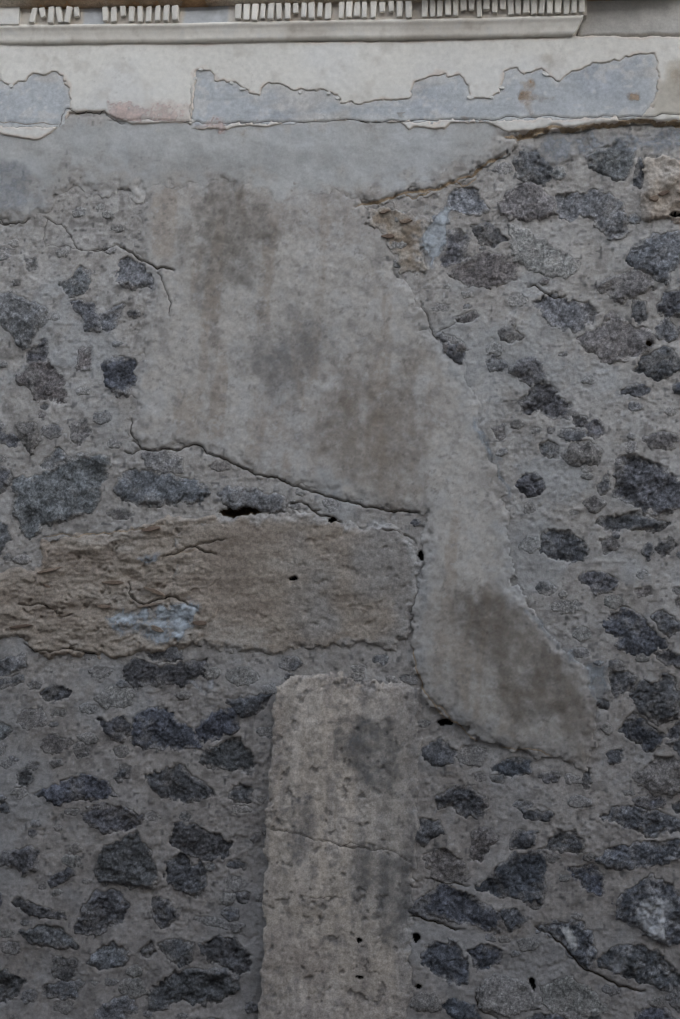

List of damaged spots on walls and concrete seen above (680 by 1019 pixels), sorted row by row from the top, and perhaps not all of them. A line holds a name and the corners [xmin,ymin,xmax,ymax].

flaking render [0,72,71,128]
crack [1,89,680,207]
flaking render [191,54,659,129]
crack [124,422,418,539]